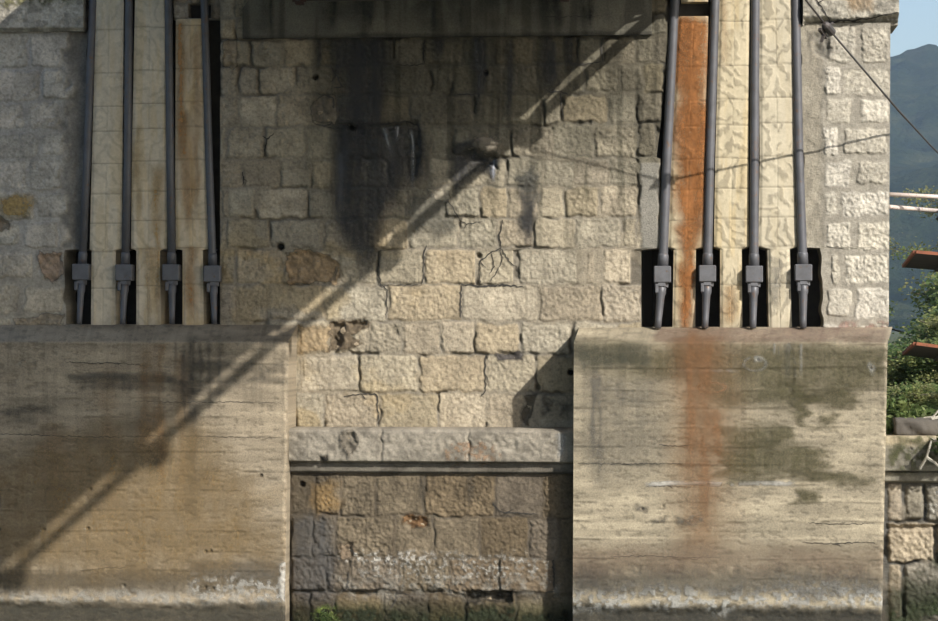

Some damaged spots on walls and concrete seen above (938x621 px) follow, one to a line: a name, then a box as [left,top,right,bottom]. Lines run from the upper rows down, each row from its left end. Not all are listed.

water stain [331,38,423,259]
water stain [450,142,498,190]
water stain [517,173,538,228]
rust [676,18,708,332]
crack [459,220,523,318]
spalling [298,319,370,354]